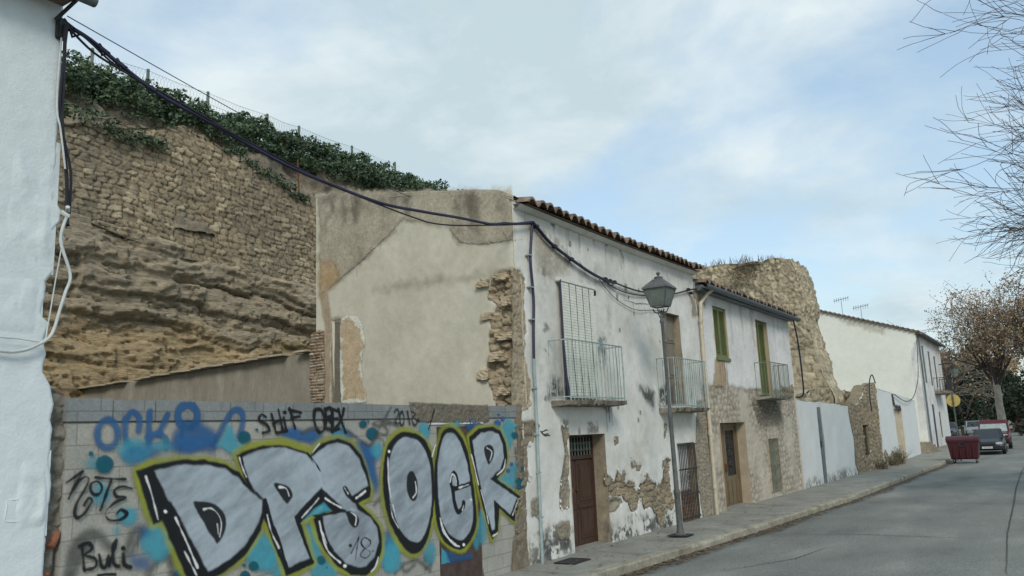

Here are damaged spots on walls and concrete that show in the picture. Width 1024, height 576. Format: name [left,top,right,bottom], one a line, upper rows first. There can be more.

flaking render [308,330,325,403]
flaking render [340,316,367,404]
spalling [474,268,540,555]
leakage [640,385,674,406]
flaking render [557,421,598,540]
flaking render [604,456,675,526]